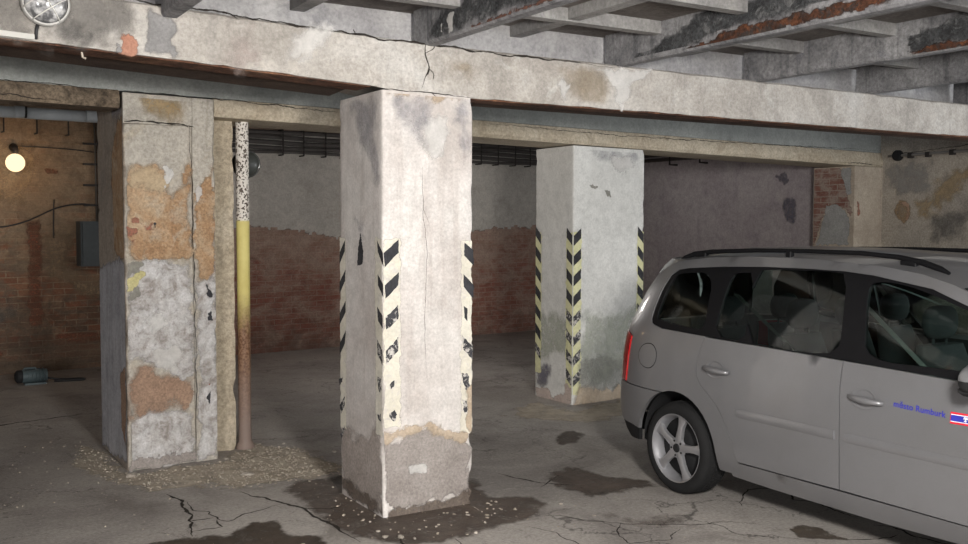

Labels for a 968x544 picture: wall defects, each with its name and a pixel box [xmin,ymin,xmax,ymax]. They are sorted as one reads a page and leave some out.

corrosion [687,0,889,49]
crack [191,7,623,98]
peeling [100,118,215,461]
flaking render [341,385,472,518]
water stain [150,521,326,544]
crack [167,492,360,542]
water stain [288,476,545,544]
crack [533,515,713,544]
crack [791,495,947,544]